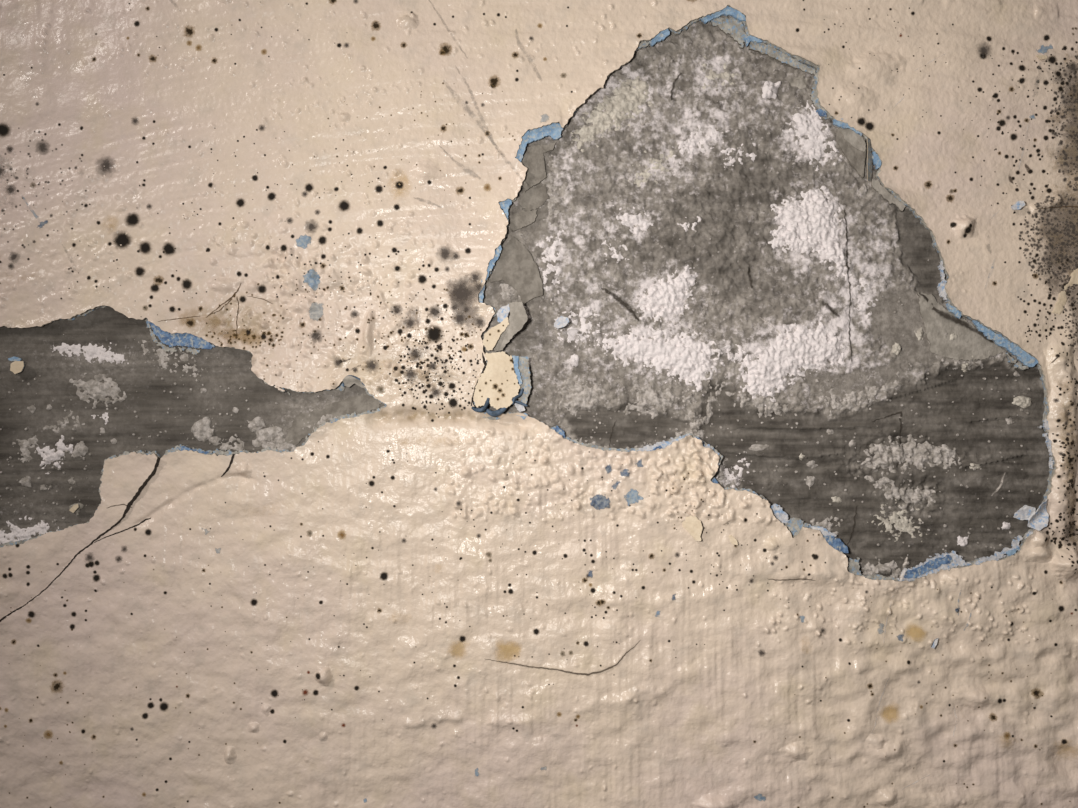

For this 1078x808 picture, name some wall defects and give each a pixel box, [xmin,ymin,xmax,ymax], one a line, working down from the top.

water stain [829,87,874,130]
water stain [0,123,176,299]
peeling [471,6,1055,581]
water stain [955,28,1078,574]
water stain [3,565,34,623]
crack [0,457,160,622]
peeling [0,306,387,547]
crack [221,454,235,477]